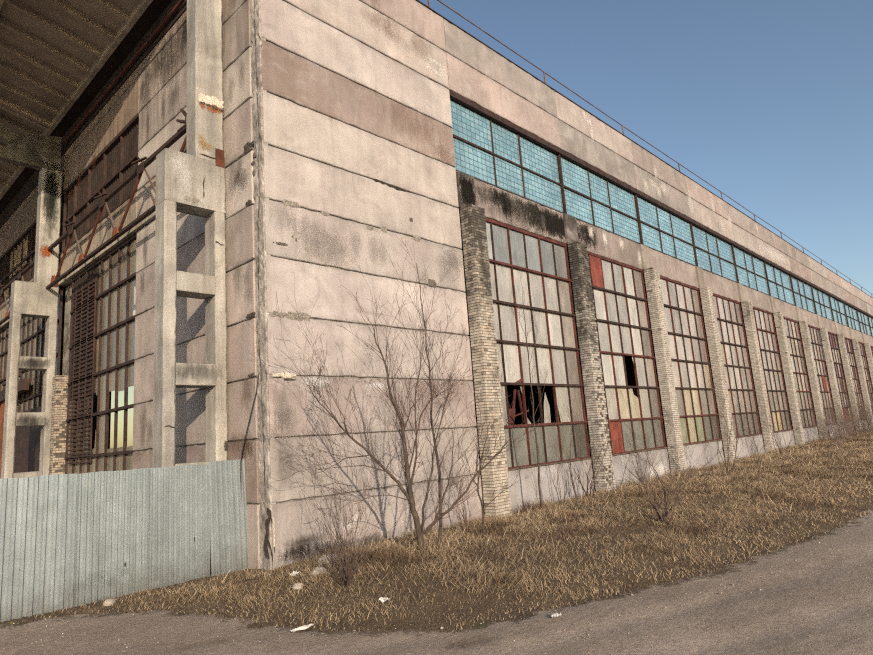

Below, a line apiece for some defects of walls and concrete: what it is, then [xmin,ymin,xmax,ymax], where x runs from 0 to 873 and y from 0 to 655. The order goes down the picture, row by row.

spalling [198,93,224,112]
water stain [47,174,56,223]
water stain [463,181,473,202]
water stain [493,190,565,234]
water stain [577,226,607,244]
spalling [268,311,311,321]